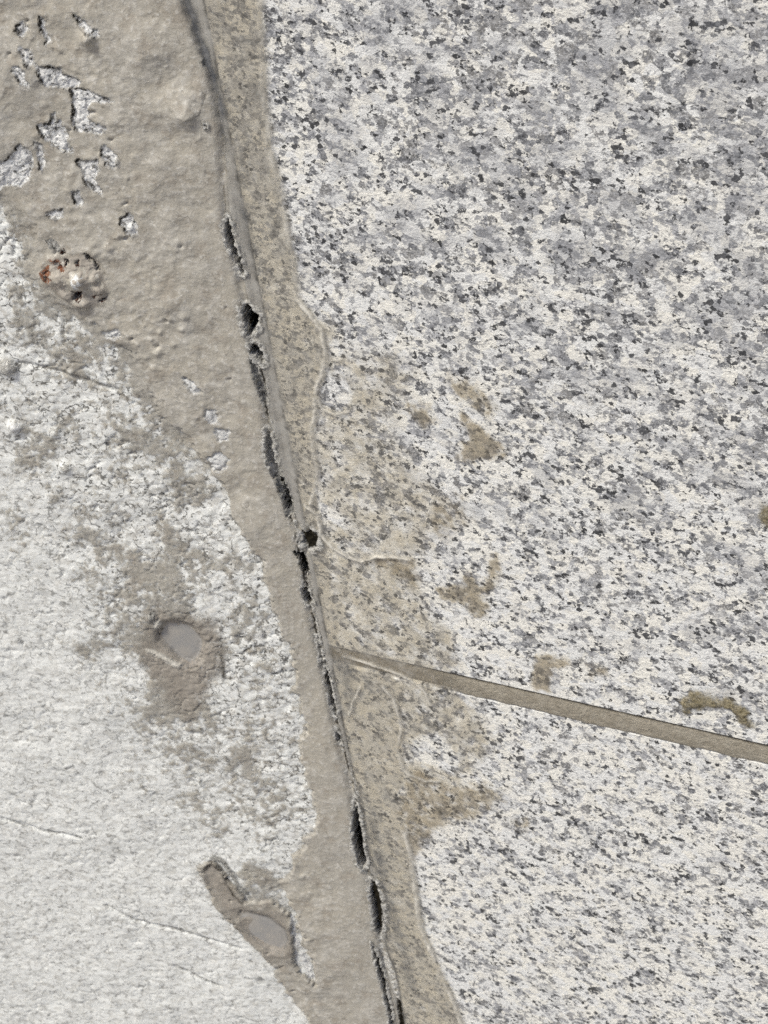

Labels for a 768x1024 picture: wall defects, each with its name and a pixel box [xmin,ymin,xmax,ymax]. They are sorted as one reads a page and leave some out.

peeling [0,14,119,221]
peeling [118,212,138,236]
crack [218,213,250,279]
crack [249,359,405,1024]